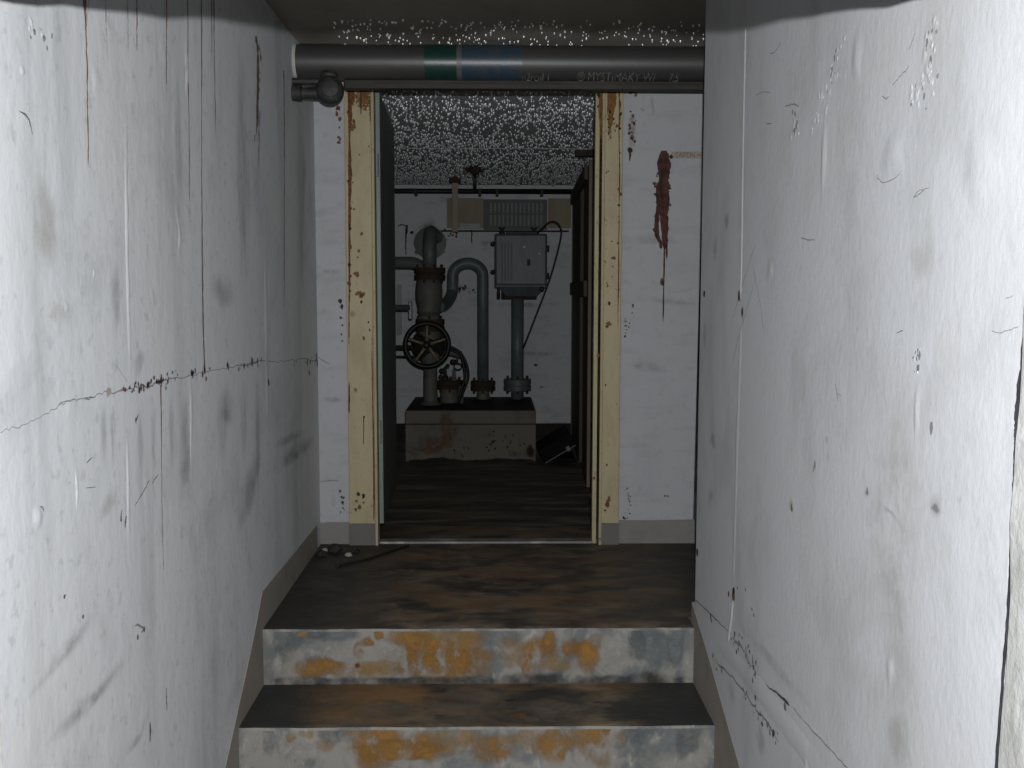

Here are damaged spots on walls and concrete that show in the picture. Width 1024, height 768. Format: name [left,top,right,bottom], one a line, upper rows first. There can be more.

corrosion [335,90,373,344]
corrosion [596,92,637,305]
corrosion [653,151,673,319]
crack [1,352,329,433]
corrosion [355,358,375,520]
corrosion [300,658,392,676]
corrosion [364,631,490,674]
corrosion [350,729,610,768]
corrosion [508,631,598,671]
crack [695,600,847,768]